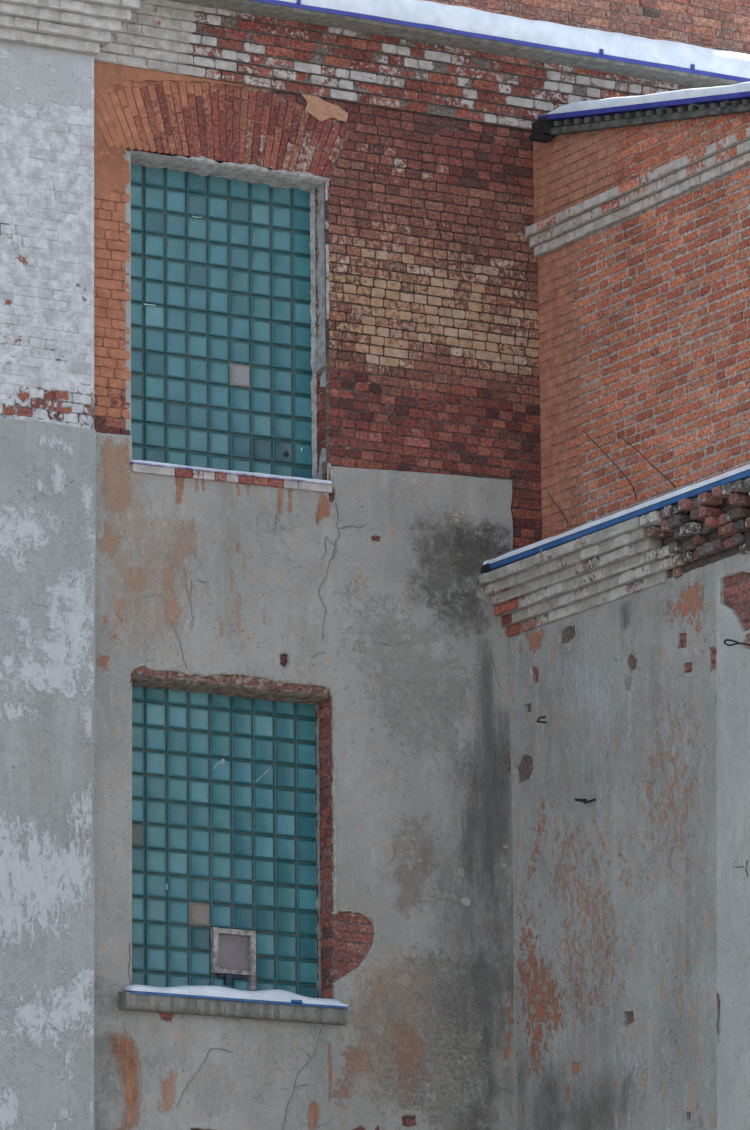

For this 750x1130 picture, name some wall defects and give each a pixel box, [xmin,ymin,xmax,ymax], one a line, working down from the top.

peeling [32,434,74,495]
peeling [0,484,147,739]
crack [312,503,366,657]
water stain [419,526,505,633]
spalling [665,569,750,650]
spalling [707,645,717,675]
peeling [0,783,92,957]
spalling [127,650,378,985]
peeling [0,965,94,1081]
crack [177,1048,231,1107]
crack [283,1023,324,1129]
spalling [398,1112,419,1129]